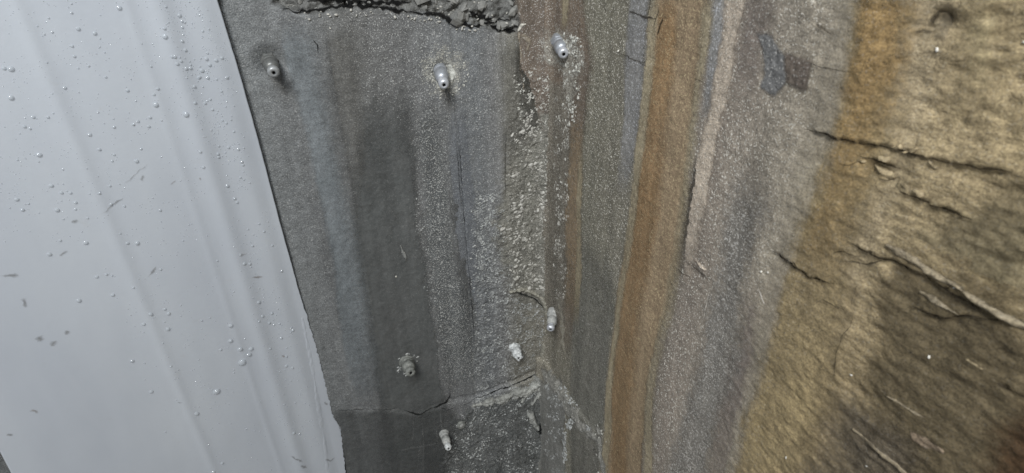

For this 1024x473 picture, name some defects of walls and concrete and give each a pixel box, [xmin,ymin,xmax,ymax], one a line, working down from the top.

water stain [284,29,612,473]
rust [601,0,711,473]
crack [766,241,998,379]
crack [806,129,1012,220]
crack [341,374,536,415]